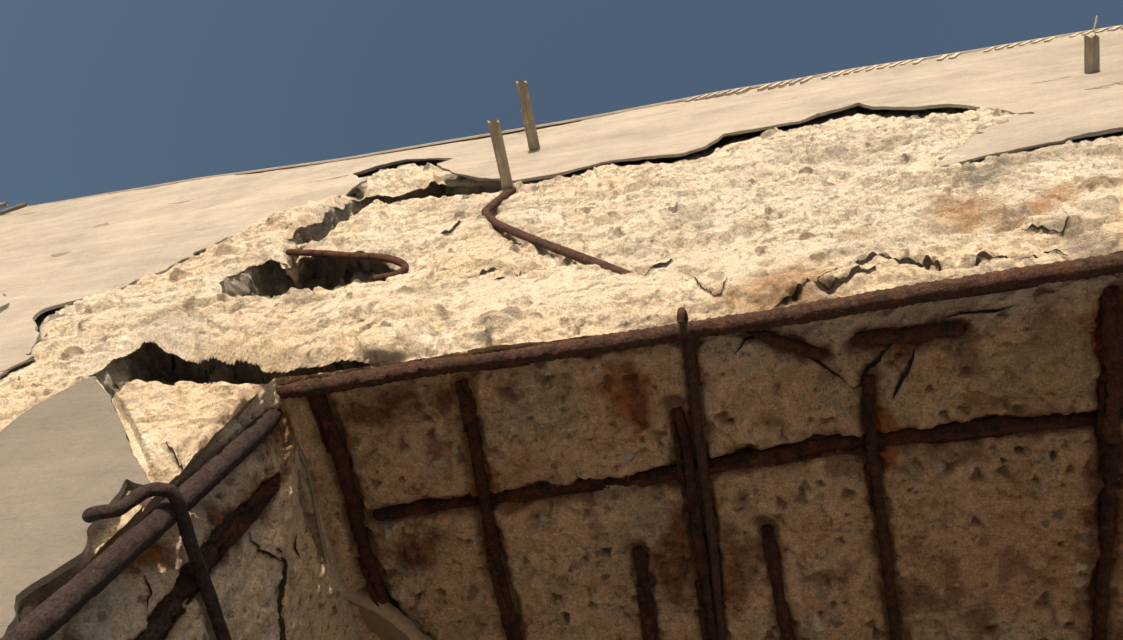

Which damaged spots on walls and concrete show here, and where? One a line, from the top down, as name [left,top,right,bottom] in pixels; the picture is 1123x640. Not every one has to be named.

rust [345,361,473,437]
spalling [0,106,1123,420]
rust [793,309,845,324]
spalling [694,273,1123,458]
crack [774,210,1069,308]
flaking render [0,376,167,638]
rust [137,587,200,640]
rust [200,476,280,574]
crack [249,531,300,640]
spalling [88,341,702,640]
rust [470,464,603,640]
spalling [696,419,1123,640]